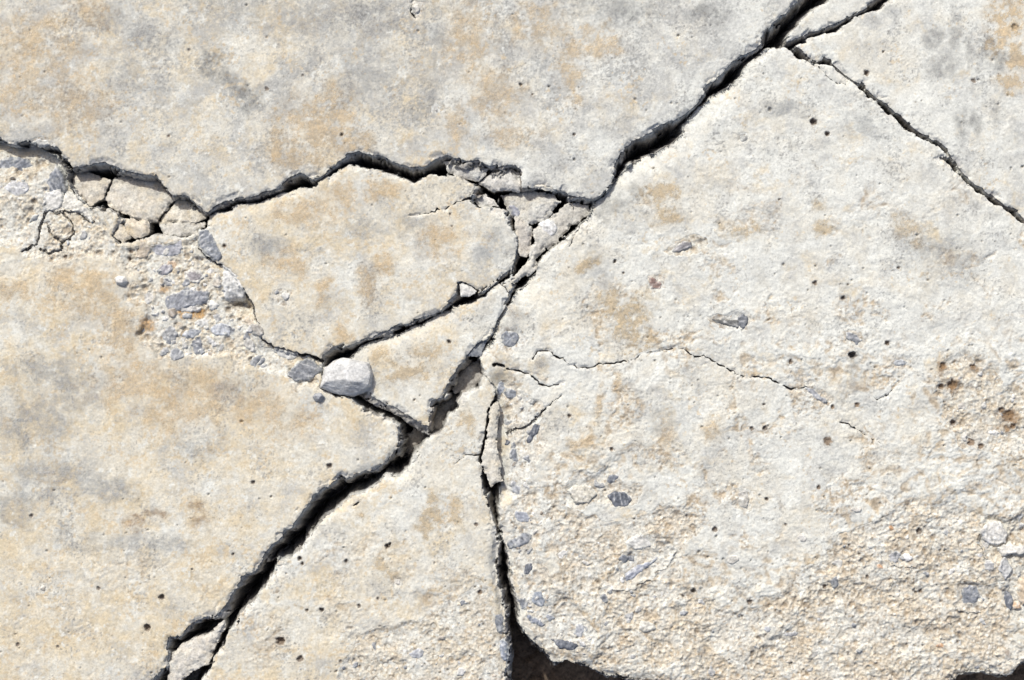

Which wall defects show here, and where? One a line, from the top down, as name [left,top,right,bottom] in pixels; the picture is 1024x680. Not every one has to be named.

spalling [0,137,323,393]
crack [0,0,1024,377]
crack [532,348,804,390]
crack [153,355,642,680]
crack [949,661,1024,680]